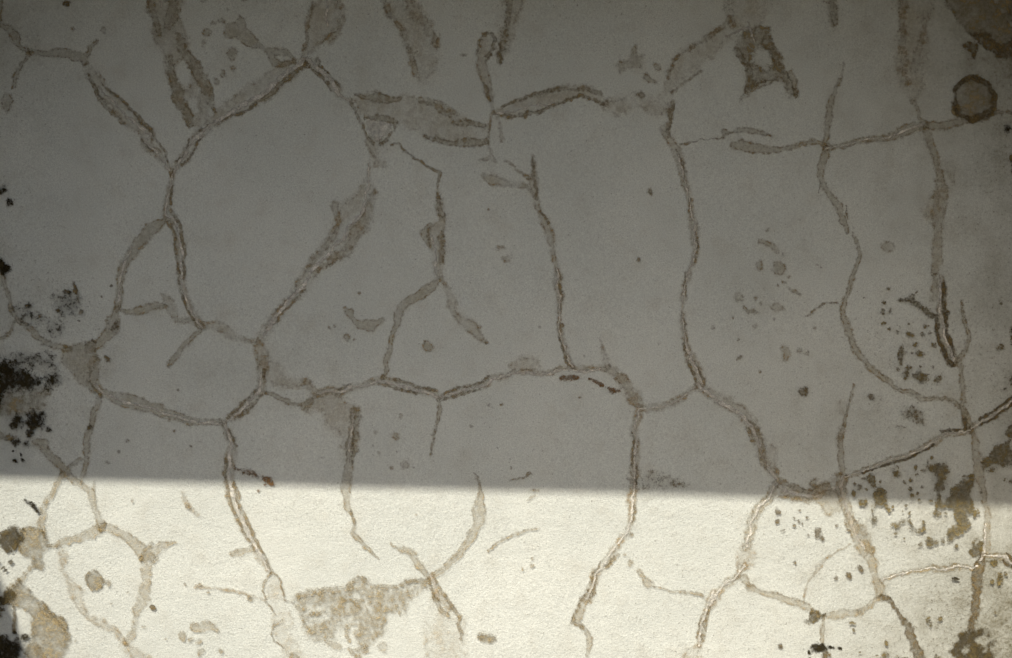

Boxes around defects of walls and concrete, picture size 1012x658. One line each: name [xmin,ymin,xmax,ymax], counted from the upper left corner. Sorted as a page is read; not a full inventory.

mould [0,350,61,405]
mould [11,282,83,333]
crack [0,0,629,658]
crack [572,78,1012,658]
mould [881,287,942,383]
mould [9,411,52,463]
mould [851,425,1012,548]
damp [0,631,30,658]